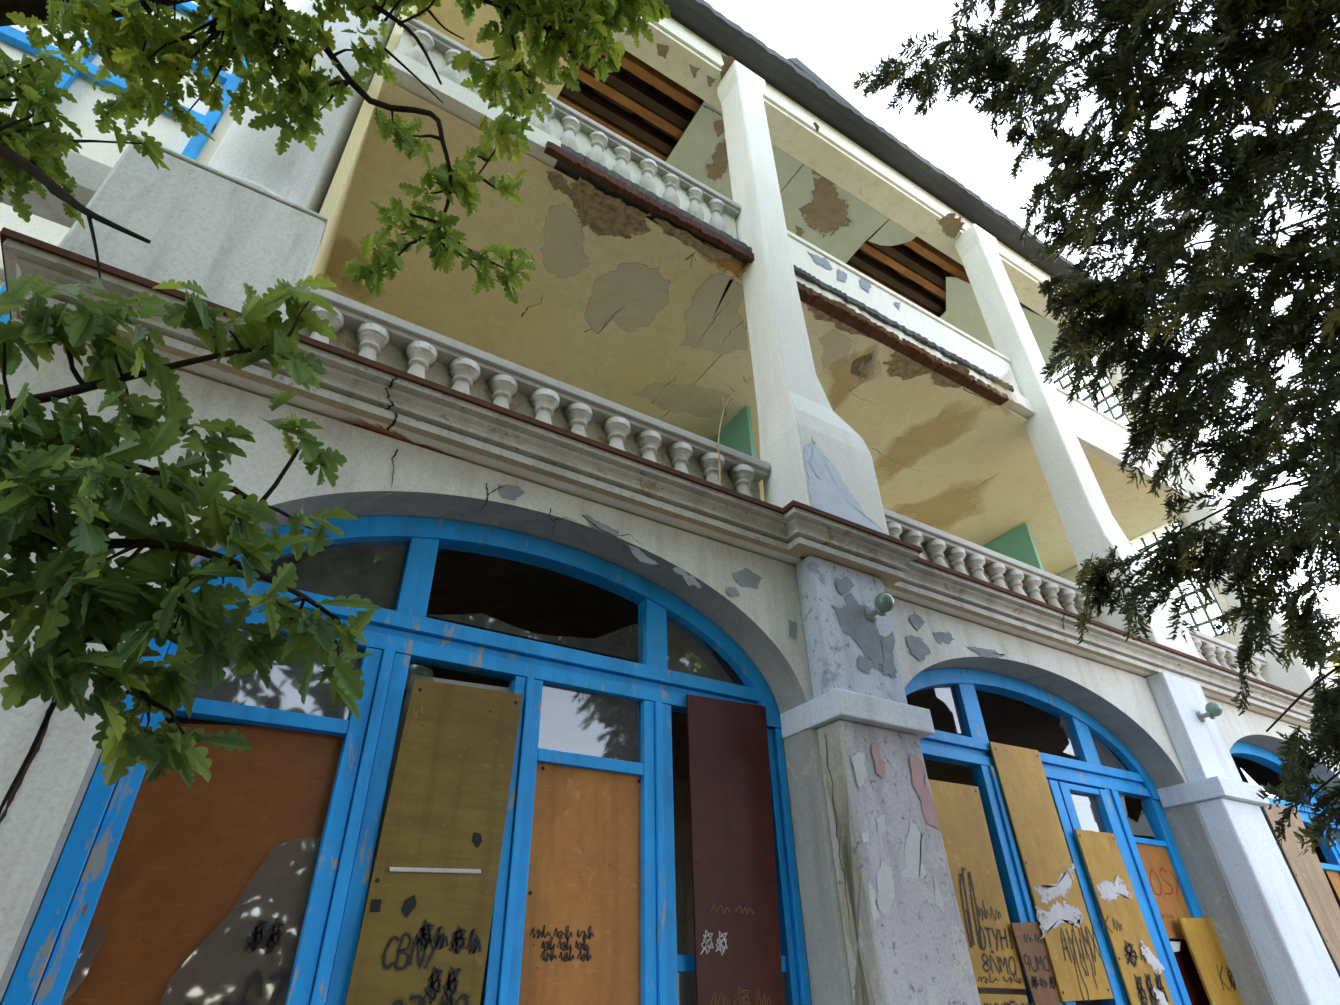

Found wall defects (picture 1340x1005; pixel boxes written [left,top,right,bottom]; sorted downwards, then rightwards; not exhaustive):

peeling [541,144,752,354]
peeling [796,170,871,292]
peeling [936,213,965,238]
spalling [796,281,1009,406]
peeling [726,568,762,597]